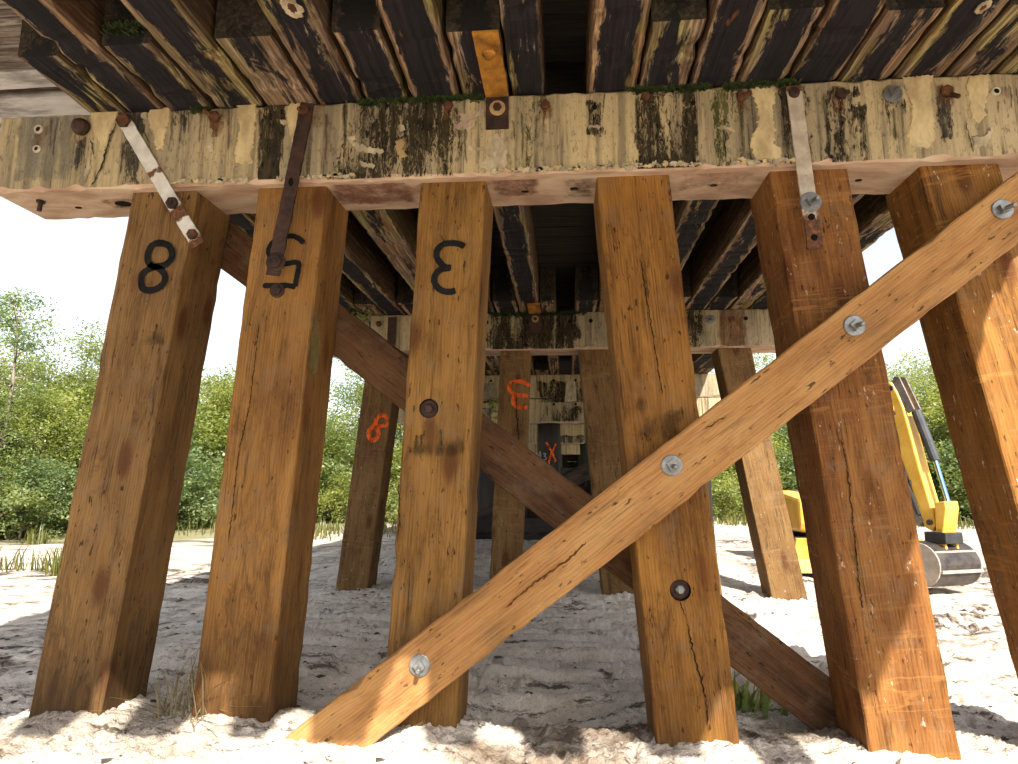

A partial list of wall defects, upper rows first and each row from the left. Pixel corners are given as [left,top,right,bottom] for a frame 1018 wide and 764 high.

peeling [91,112,119,153]
peeling [141,107,171,150]
peeling [280,102,311,143]
damp [325,100,467,180]
damp [513,96,547,173]
damp [586,93,606,137]
damp [634,88,700,169]
damp [710,89,751,166]
peeling [730,84,796,167]
peeling [902,75,936,149]
crack [840,437,863,608]
crack [677,584,709,724]